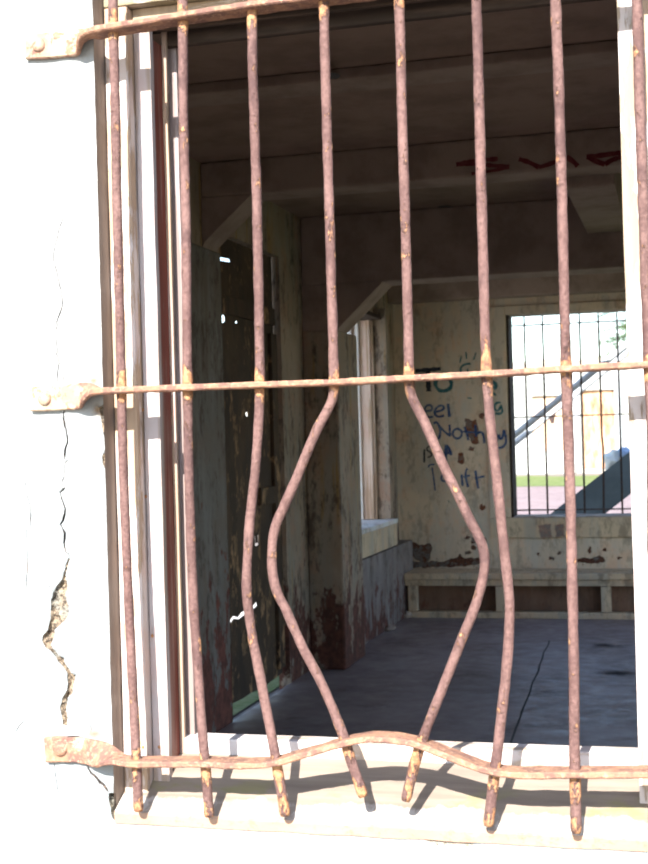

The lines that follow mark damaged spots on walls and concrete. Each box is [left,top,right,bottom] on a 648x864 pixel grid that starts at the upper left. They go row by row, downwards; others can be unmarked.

crack [53,159,64,384]
crack [25,410,76,725]
peeling [413,536,486,568]
peeling [538,524,565,539]
peeling [577,546,608,564]
crack [510,640,550,743]
crack [88,766,117,820]
peeling [426,840,474,851]